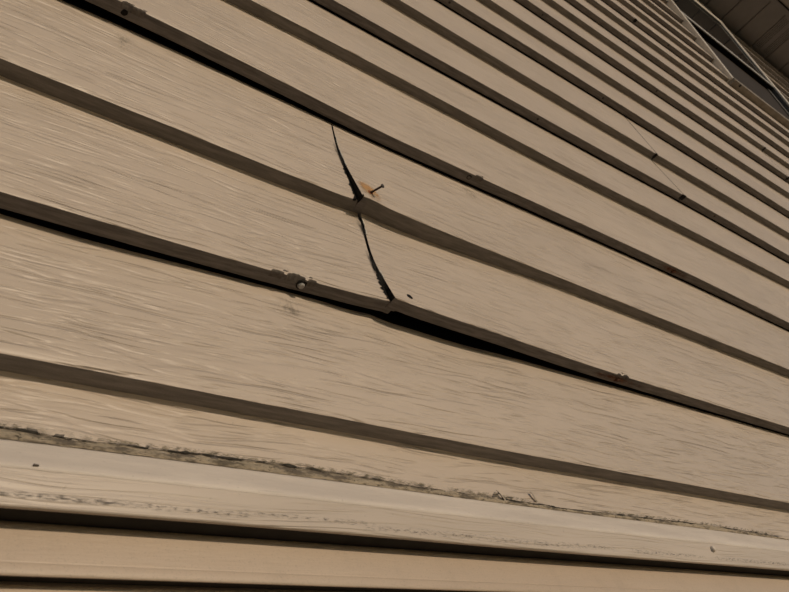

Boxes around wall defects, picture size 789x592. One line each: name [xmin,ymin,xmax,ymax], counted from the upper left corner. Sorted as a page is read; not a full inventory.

crack [331,124,394,306]